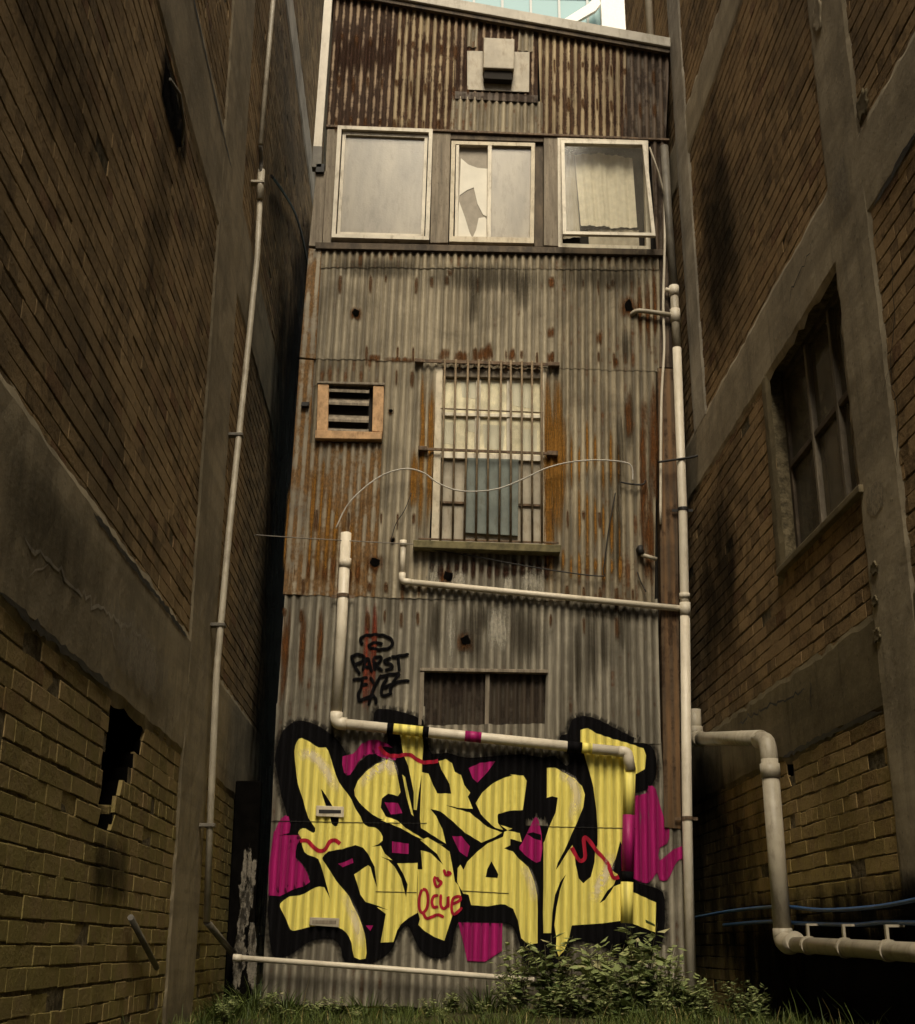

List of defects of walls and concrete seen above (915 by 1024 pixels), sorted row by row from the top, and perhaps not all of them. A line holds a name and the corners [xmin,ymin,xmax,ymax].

corrosion [334,19,481,132]
corrosion [529,49,538,76]
corrosion [568,49,626,85]
corrosion [553,95,656,128]
corrosion [415,270,453,293]
corrosion [440,344,492,367]
corrosion [284,461,382,594]
corrosion [365,346,434,523]
corrosion [430,382,622,637]
corrosion [626,387,658,580]
crack [24,535,152,650]
peeling [233,850,257,993]